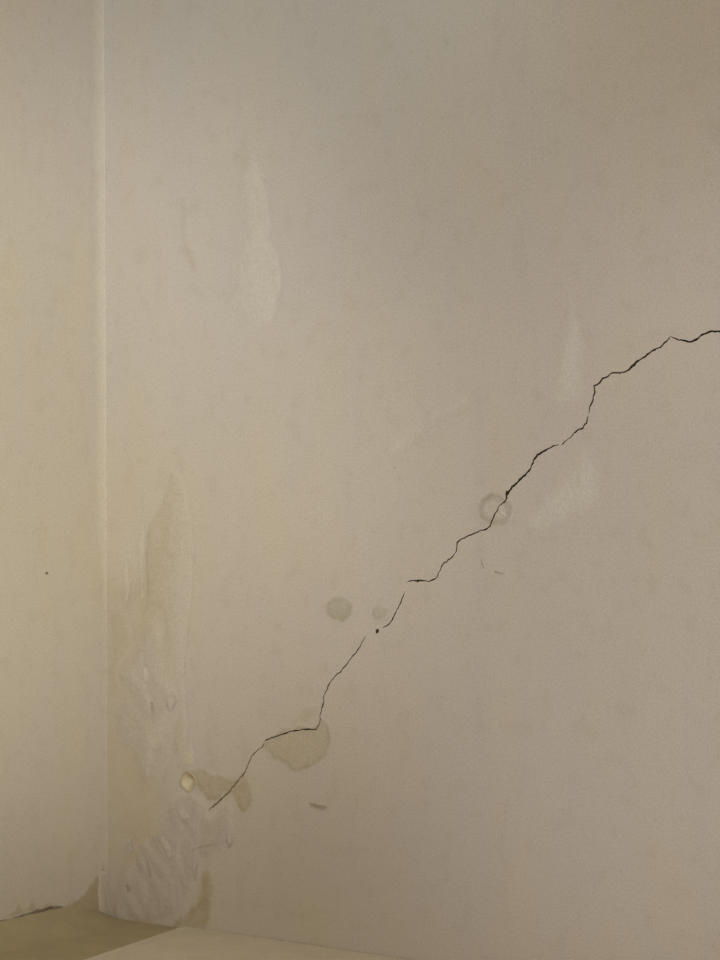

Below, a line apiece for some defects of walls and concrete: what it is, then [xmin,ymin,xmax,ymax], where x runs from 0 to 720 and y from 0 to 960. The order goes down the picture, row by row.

damp [109,467,256,819]
damp [168,864,219,930]
damp [259,699,334,777]
crack [209,330,720,810]